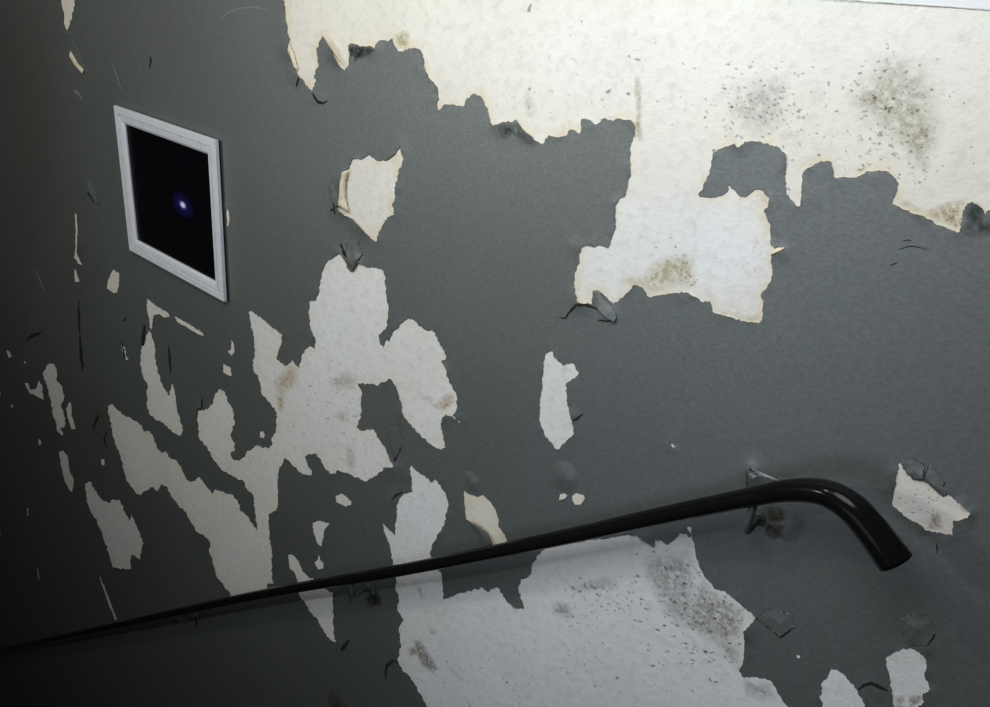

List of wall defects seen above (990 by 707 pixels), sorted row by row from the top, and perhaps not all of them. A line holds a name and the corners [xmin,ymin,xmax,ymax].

peeling [284,0,990,323]
peeling [24,363,76,436]
peeling [107,147,460,596]
peeling [539,351,579,449]
peeling [59,451,144,570]
peeling [464,491,507,547]
peeling [559,493,585,505]
peeling [892,457,971,536]
peeling [288,521,336,642]
peeling [395,526,788,707]
peeling [818,669,865,707]
peeling [885,612,935,707]